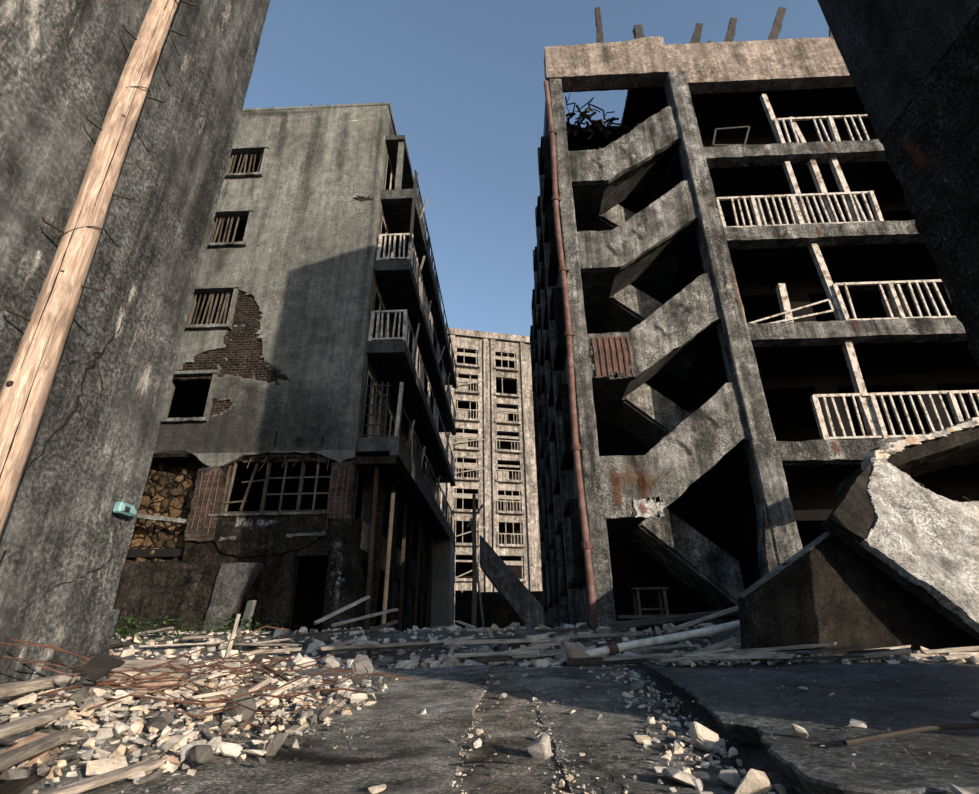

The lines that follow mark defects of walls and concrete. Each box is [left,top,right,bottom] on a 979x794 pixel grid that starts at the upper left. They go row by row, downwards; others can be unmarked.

spalling [173,291,290,387]
crack [26,315,124,470]
spalling [633,496,669,520]